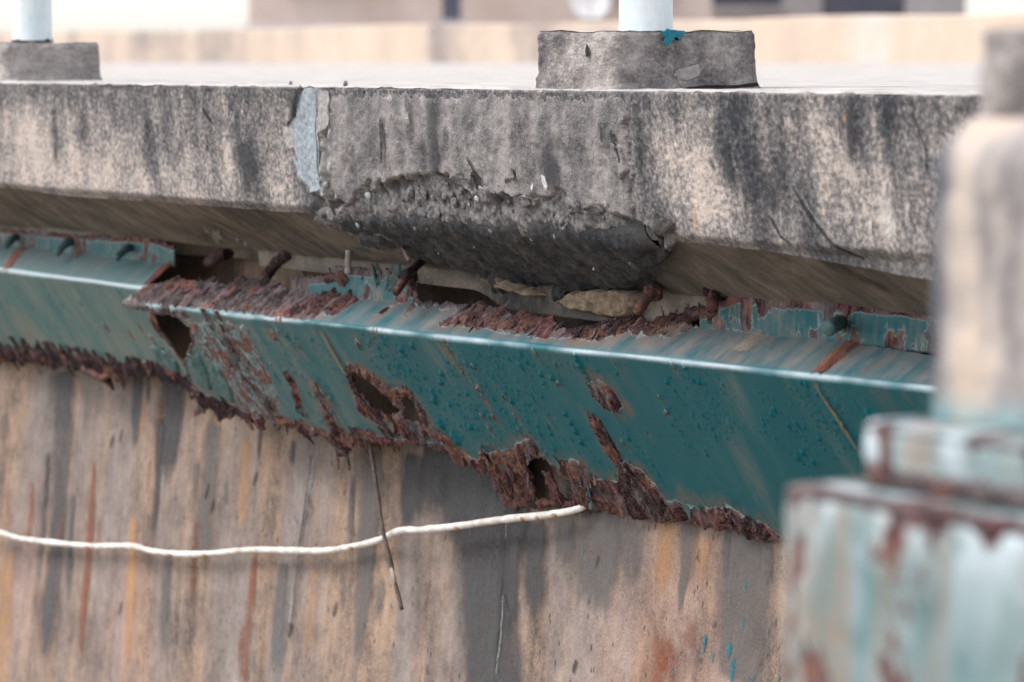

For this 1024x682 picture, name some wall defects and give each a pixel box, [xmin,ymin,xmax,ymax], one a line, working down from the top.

spalling [284,86,630,253]
spalling [481,277,644,318]
spalling [637,211,677,268]
damp [40,371,74,650]
corrosion [80,464,99,642]
corrosion [0,336,254,431]
damp [152,382,184,528]
corrosion [239,559,257,680]
damp [348,448,383,647]
corrosion [130,261,721,523]
damp [400,444,638,682]
damp [720,527,771,682]